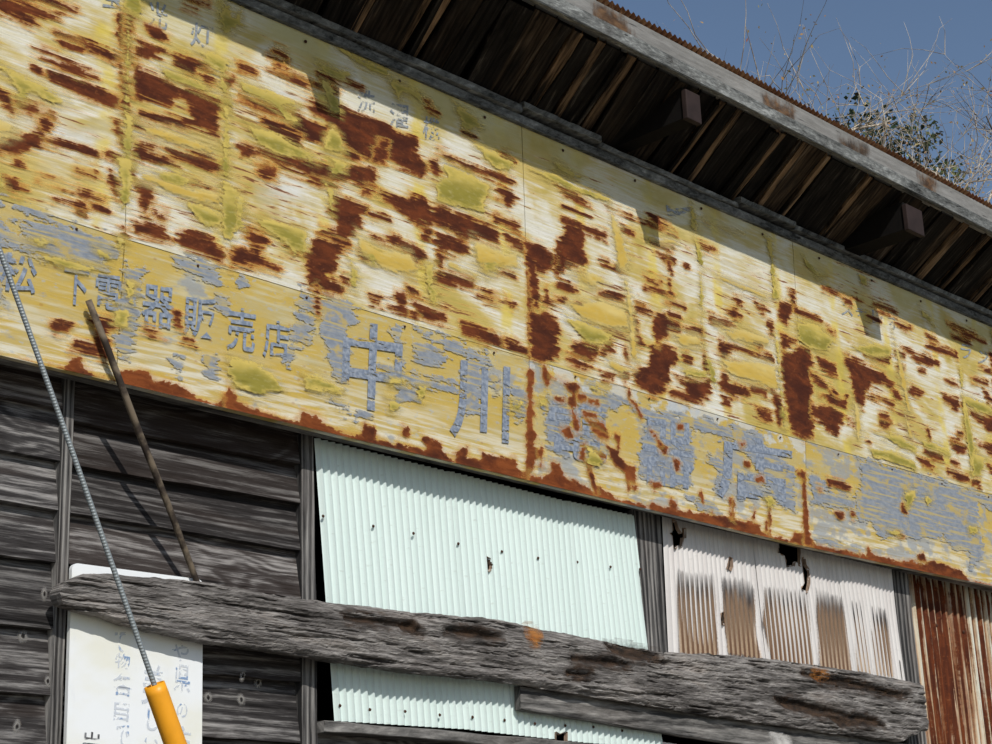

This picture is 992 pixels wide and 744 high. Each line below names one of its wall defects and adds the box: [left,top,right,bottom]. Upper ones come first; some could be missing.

peeling [0,174,149,362]
peeling [170,251,250,316]
peeling [116,0,314,255]
peeling [201,353,285,394]
peeling [276,282,375,423]
peeling [324,128,348,174]
peeling [356,236,438,304]
peeling [435,164,490,212]
corrosion [0,0,992,440]
peeling [564,214,637,358]
peeling [376,323,992,571]
corrosion [113,369,992,744]